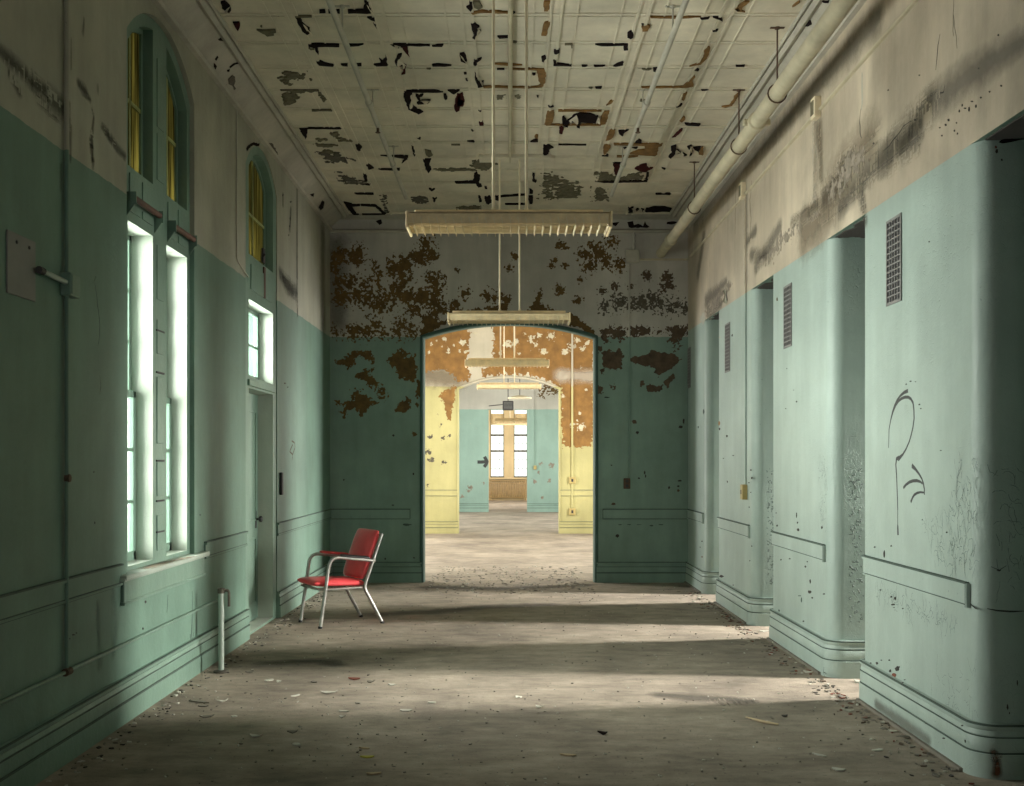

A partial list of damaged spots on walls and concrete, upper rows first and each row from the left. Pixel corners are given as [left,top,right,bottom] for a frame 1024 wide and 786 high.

peeling [221,0,240,31]
peeling [257,25,276,37]
peeling [466,0,515,40]
peeling [541,0,550,36]
peeling [214,56,238,90]
peeling [277,0,444,112]
peeling [299,15,723,225]
water stain [801,121,874,247]
peeling [330,192,688,464]